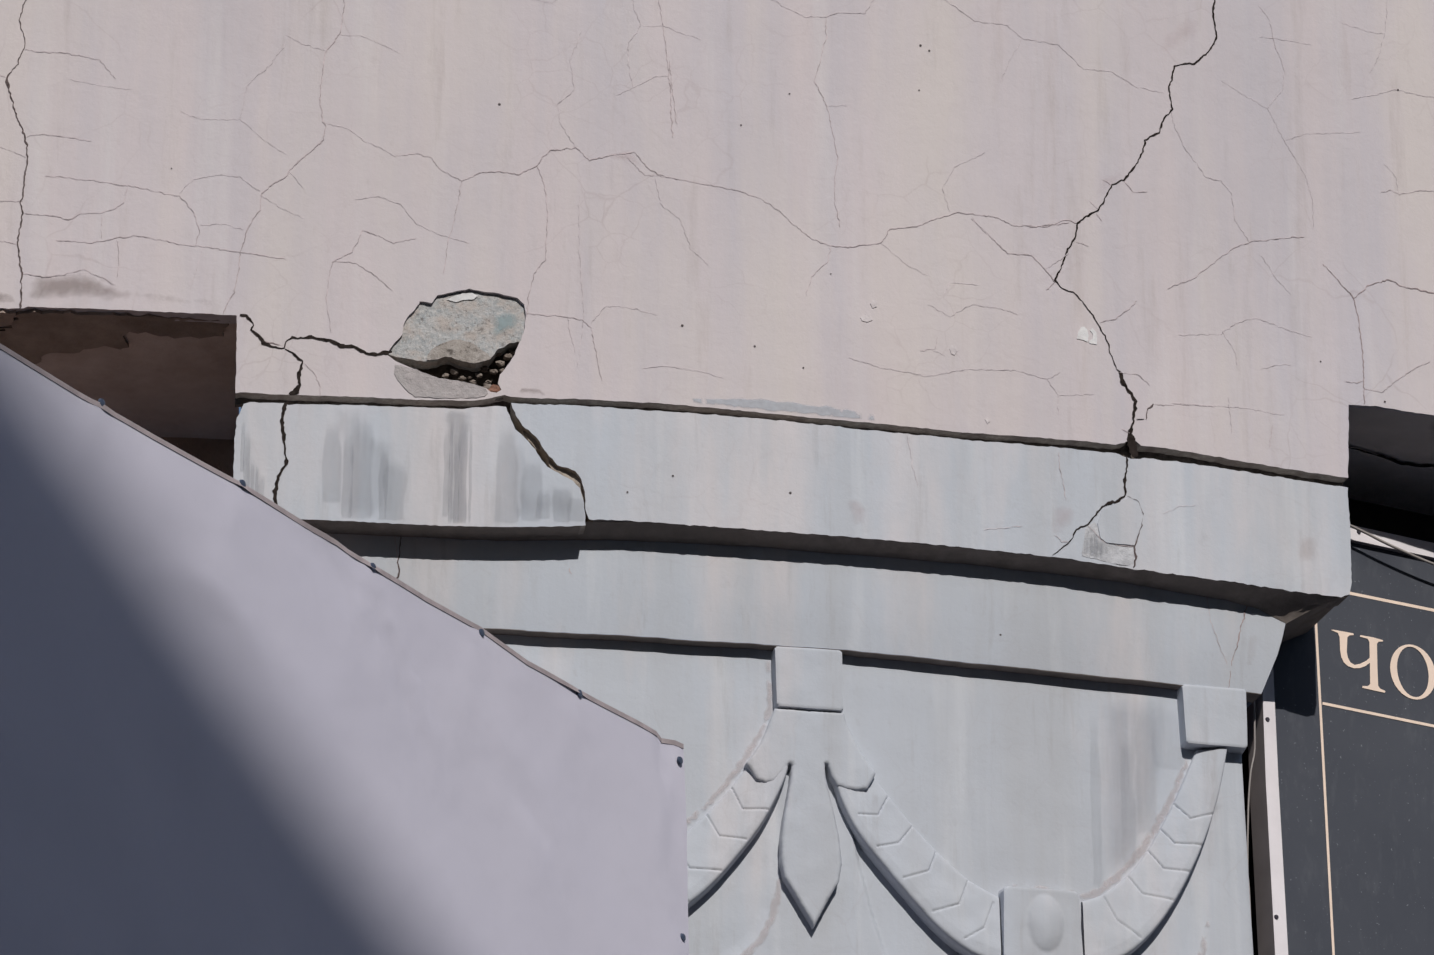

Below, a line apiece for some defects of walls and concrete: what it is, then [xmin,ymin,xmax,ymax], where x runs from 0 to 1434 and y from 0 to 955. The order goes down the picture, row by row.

flaking render [0,308,230,364]
spalling [233,290,586,538]
crack [0,0,1434,567]
crack [393,536,401,578]